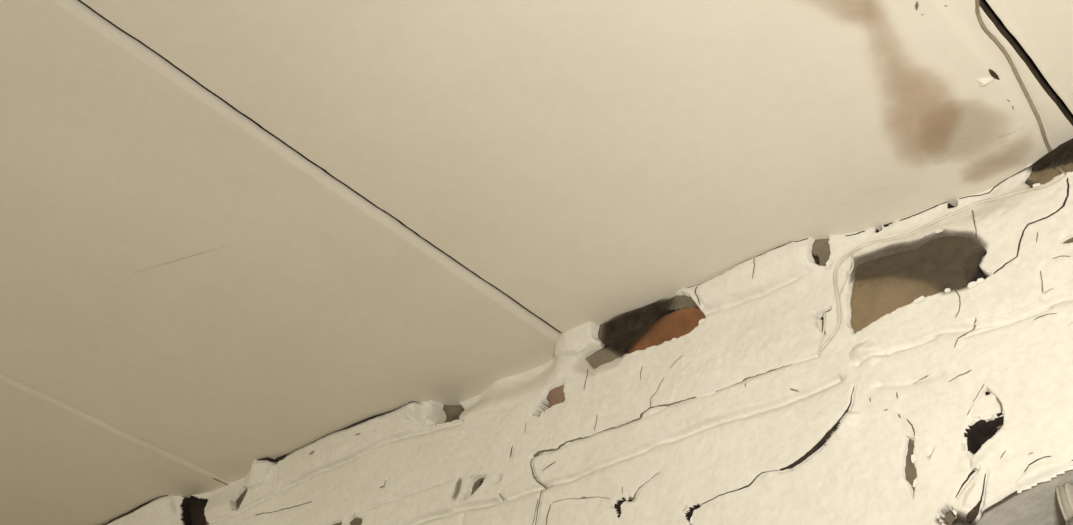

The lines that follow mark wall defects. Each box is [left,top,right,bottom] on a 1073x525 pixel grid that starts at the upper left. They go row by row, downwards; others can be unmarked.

spalling [1025,161,1073,188]
spalling [812,239,832,269]
spalling [579,295,706,369]
spalling [845,250,992,334]
crack [954,290,977,348]
spalling [528,385,565,418]
crack [510,355,799,525]
crack [701,369,1003,505]
peeling [969,391,1004,445]
spalling [945,510,958,525]